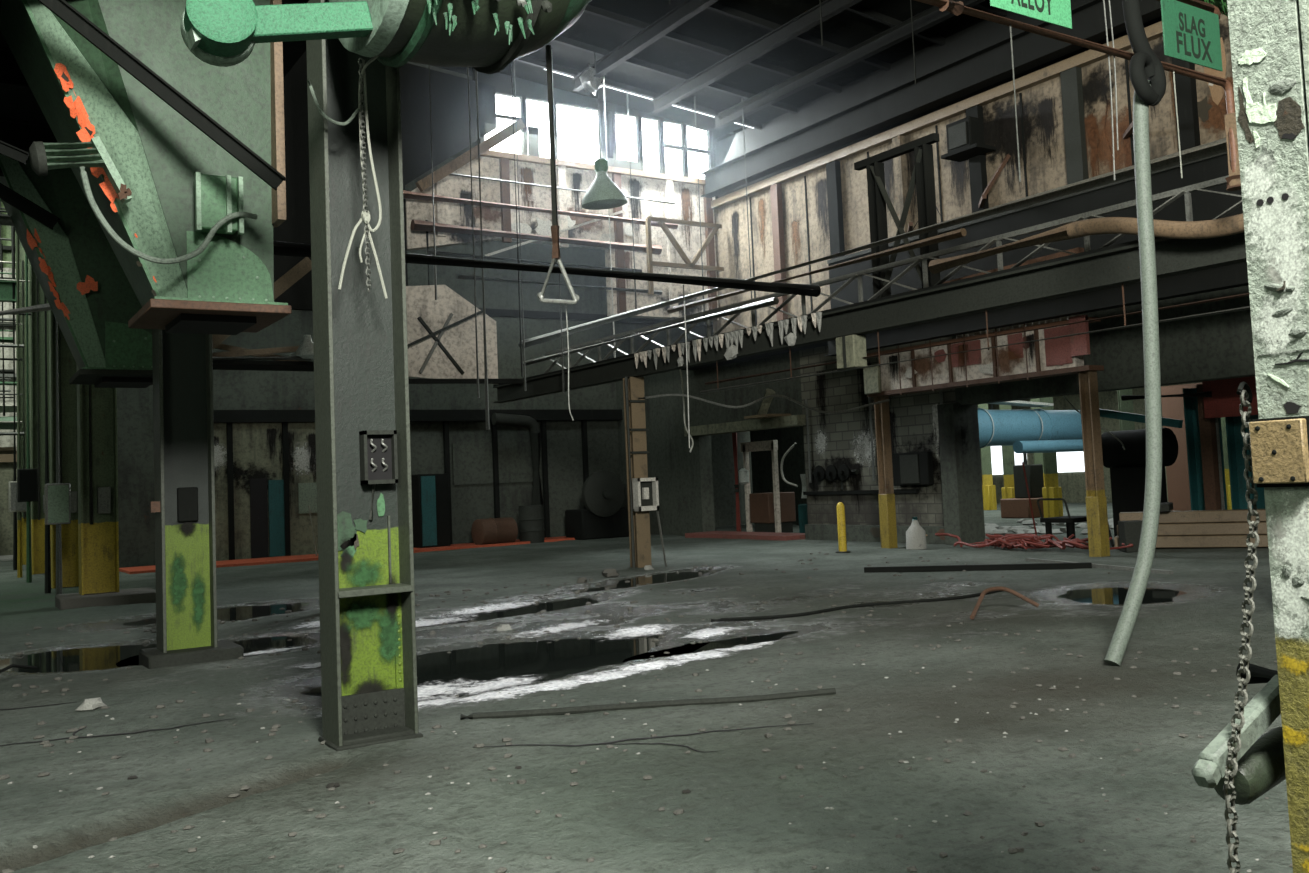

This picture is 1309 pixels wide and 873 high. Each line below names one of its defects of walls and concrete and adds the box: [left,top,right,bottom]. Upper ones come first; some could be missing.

damp [951,160,969,207]
damp [982,95,1058,192]
peeling [1197,37,1305,169]